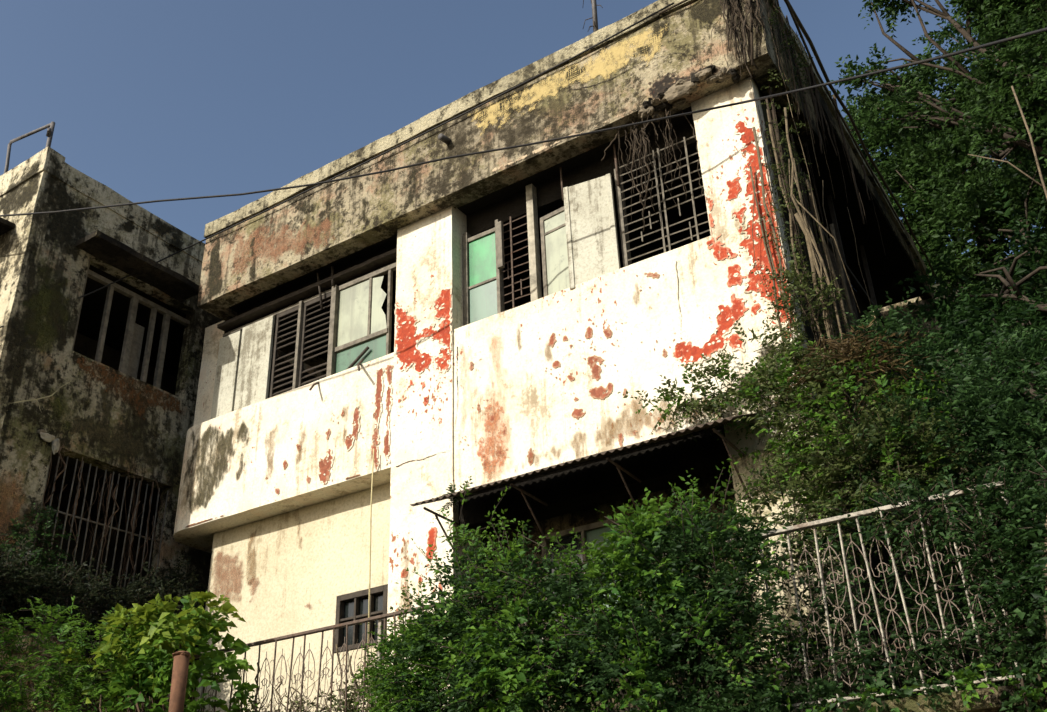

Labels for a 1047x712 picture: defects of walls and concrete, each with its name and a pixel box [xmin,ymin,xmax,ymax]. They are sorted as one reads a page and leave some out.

water stain [0,155,88,262]
mould [118,214,142,232]
mould [154,219,183,253]
water stain [207,238,222,299]
water stain [297,200,334,219]
water stain [406,171,415,204]
peeling [654,109,797,367]
water stain [1,236,69,415]
peeling [306,287,452,484]
peeling [538,321,642,429]
water stain [69,386,249,513]